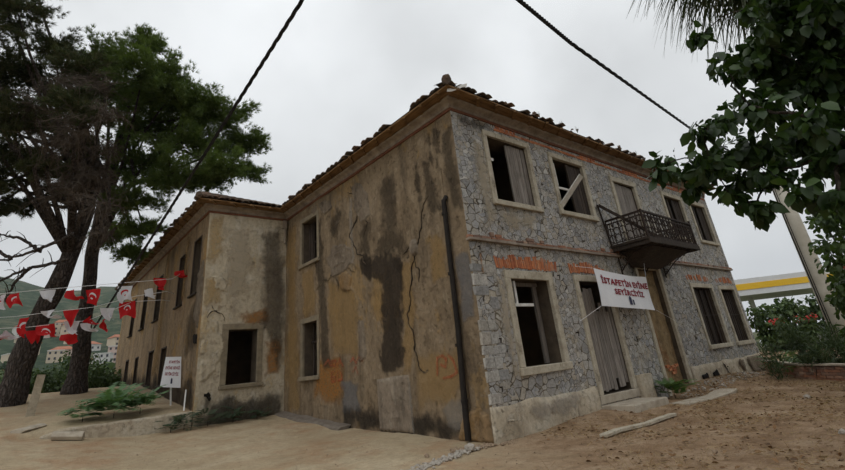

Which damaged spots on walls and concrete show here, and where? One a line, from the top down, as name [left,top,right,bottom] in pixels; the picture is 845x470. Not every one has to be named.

crack [316,216,368,290]
leakage [352,180,414,375]
crack [403,197,428,374]